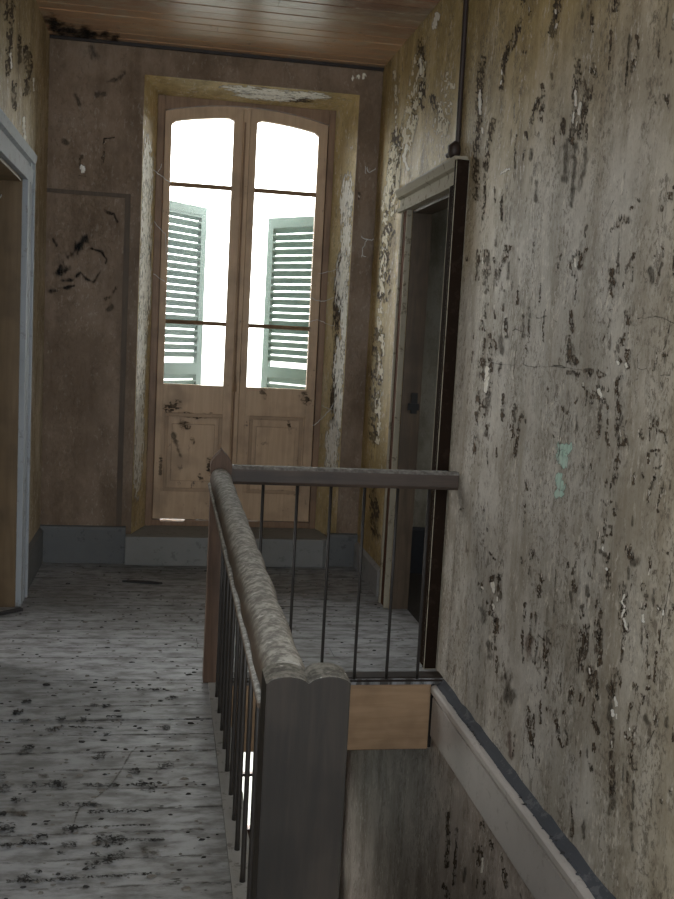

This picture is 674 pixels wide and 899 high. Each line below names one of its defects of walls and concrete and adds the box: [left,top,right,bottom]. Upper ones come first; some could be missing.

peeling [3,0,35,141]
leakage [45,18,119,57]
peeling [472,56,503,221]
peeling [499,0,532,90]
peeling [500,74,553,175]
spalling [553,59,598,145]
peeling [324,174,360,468]
peeling [368,38,455,445]
peeling [609,248,636,298]
spalling [478,551,502,673]
peeling [521,602,552,689]
peeling [526,310,674,814]